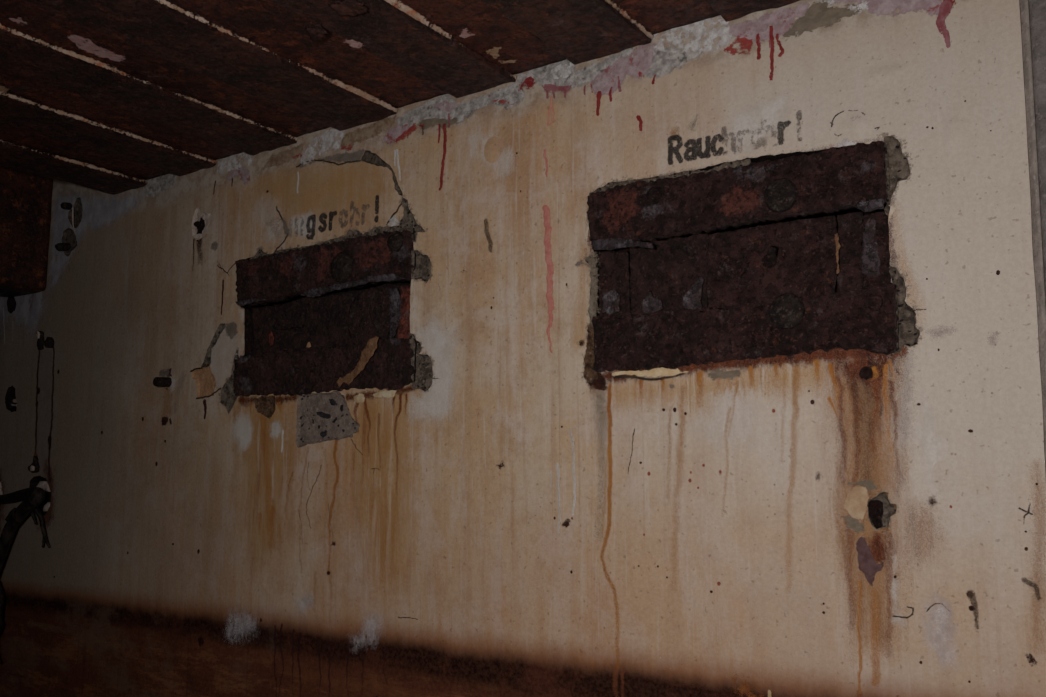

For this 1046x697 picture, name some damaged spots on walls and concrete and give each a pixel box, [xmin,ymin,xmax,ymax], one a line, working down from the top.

peeling [396,47,633,129]
peeling [645,16,734,78]
crack [296,150,403,225]
spalling [586,156,752,199]
spalling [833,132,912,224]
spalling [249,194,436,448]
rust [301,273,405,298]
rust [566,205,655,364]
rust [585,194,928,694]
rust [284,384,424,619]
spalling [865,489,898,536]
water stain [0,460,1046,697]